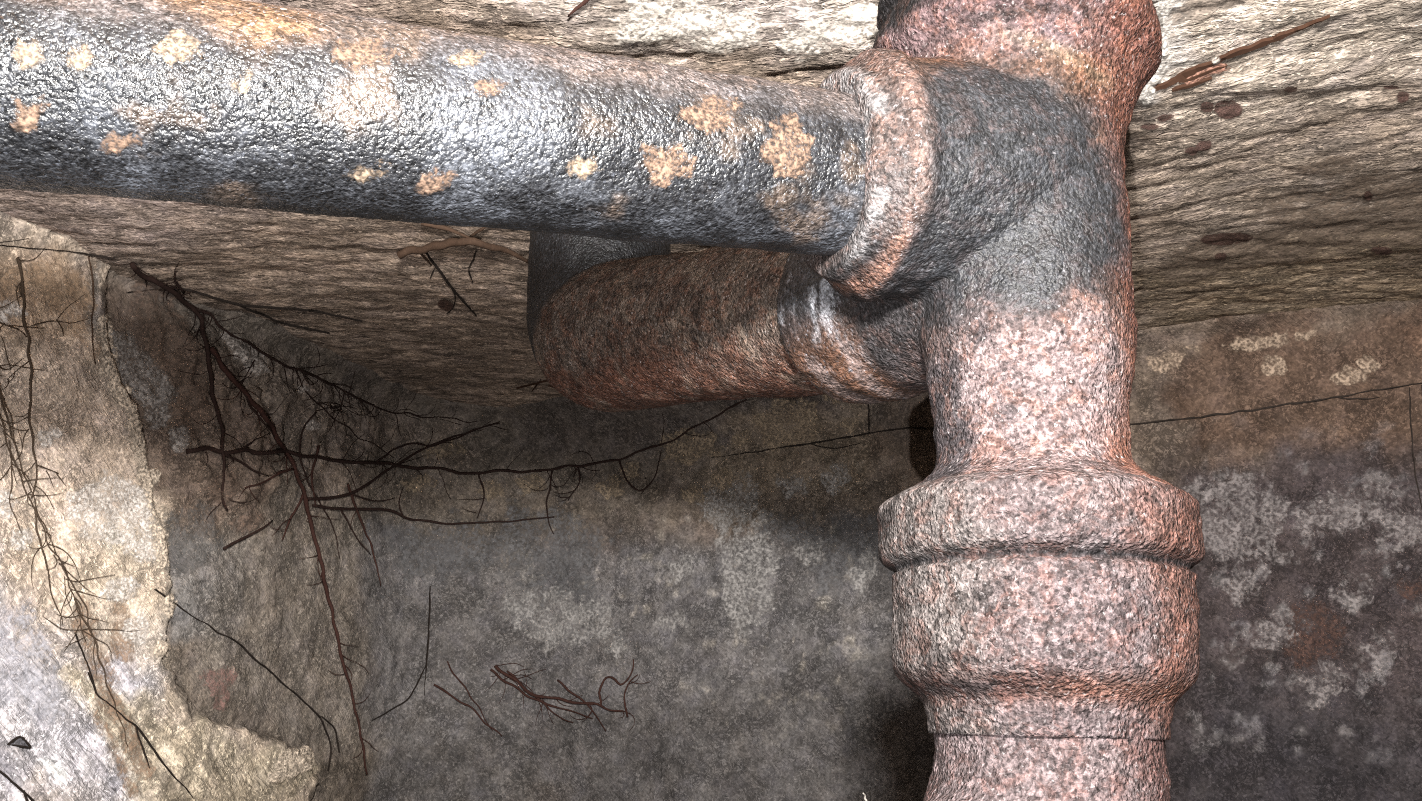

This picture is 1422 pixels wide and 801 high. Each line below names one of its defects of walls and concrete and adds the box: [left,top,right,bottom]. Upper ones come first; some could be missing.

corrosion [1141,114,1174,130]
corrosion [1200,100,1243,119]
corrosion [1384,85,1409,103]
corrosion [1185,141,1212,155]
crack [0,238,115,260]
corrosion [1201,233,1253,260]
crack [425,251,477,317]
crack [1130,383,1422,508]
crack [371,586,431,721]
crack [154,589,340,771]
crack [74,632,194,799]
crack [0,770,35,801]